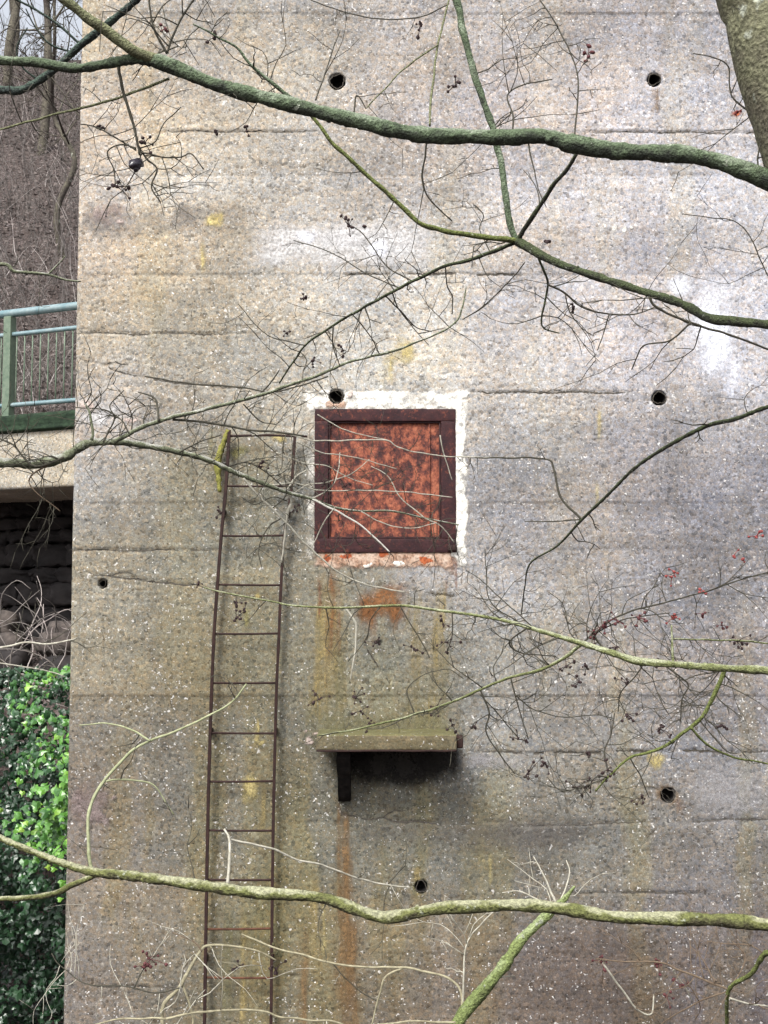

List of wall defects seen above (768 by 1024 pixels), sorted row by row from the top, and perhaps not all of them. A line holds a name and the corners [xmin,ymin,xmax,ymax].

flaking render [304,389,470,569]
corrosion [359,587,401,625]